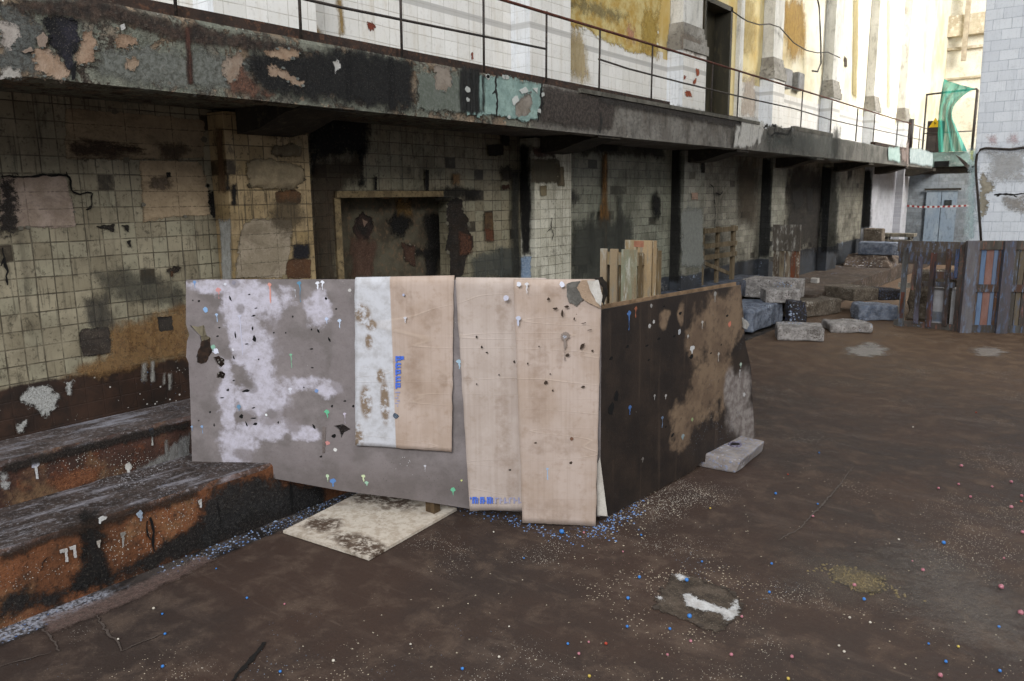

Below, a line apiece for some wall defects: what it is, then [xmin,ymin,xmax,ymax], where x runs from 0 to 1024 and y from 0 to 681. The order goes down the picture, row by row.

peeling [0,6,251,94]
leakage [18,0,298,80]
flaking render [264,47,305,88]
peeling [416,63,545,122]
crack [1,172,93,210]
flaking render [979,173,995,219]
peeling [234,217,292,279]
efflorescence [20,380,75,417]